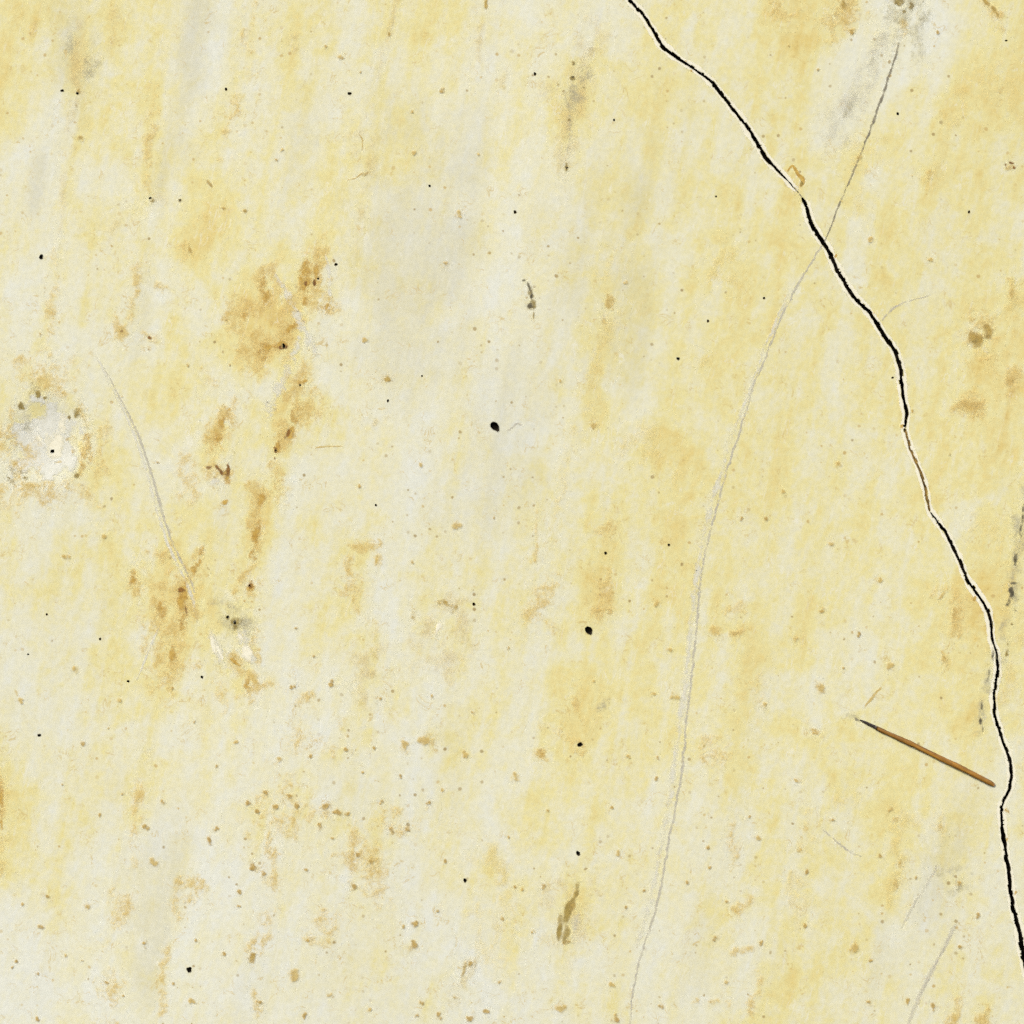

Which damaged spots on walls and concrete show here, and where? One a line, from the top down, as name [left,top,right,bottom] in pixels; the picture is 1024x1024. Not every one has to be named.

corrosion [223,247,333,376]
crack [625,0,1024,1014]